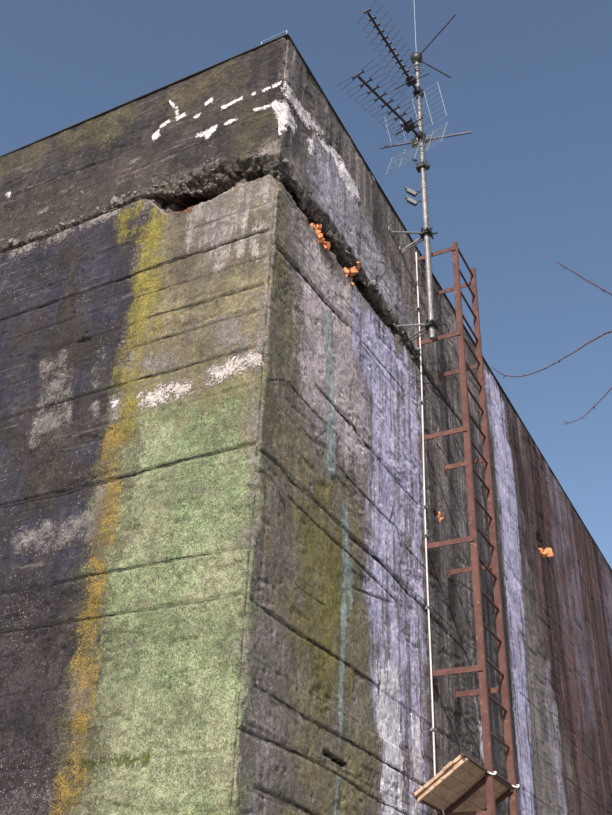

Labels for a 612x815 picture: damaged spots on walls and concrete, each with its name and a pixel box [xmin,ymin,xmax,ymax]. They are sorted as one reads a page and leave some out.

spalling [152,152,284,213]
leakage [152,81,412,328]
spalling [310,223,331,251]
spalling [343,261,360,285]
leakage [0,199,159,815]
leakage [352,291,430,815]